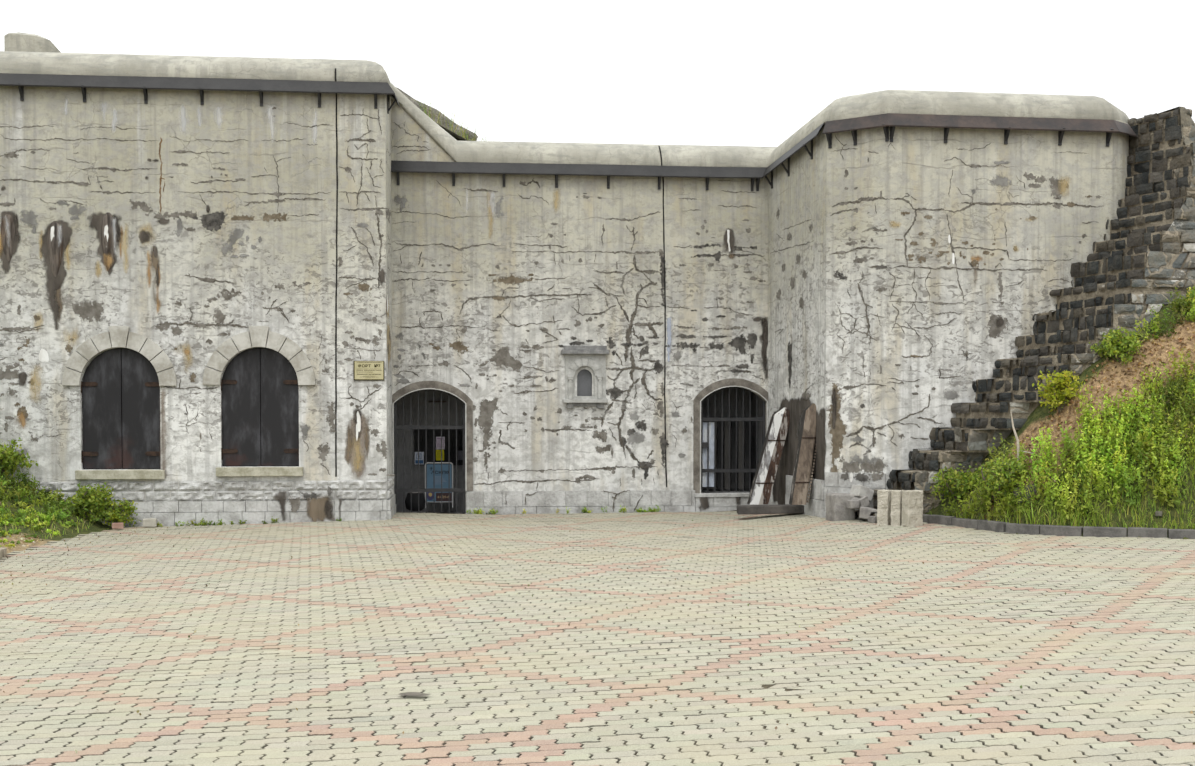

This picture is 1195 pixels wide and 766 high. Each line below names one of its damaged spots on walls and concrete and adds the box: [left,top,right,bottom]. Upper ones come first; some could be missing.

rust [147,246,160,312]
crack [0,110,756,511]
spalling [393,309,757,479]
damp [772,383,846,505]
crack [774,134,1100,455]